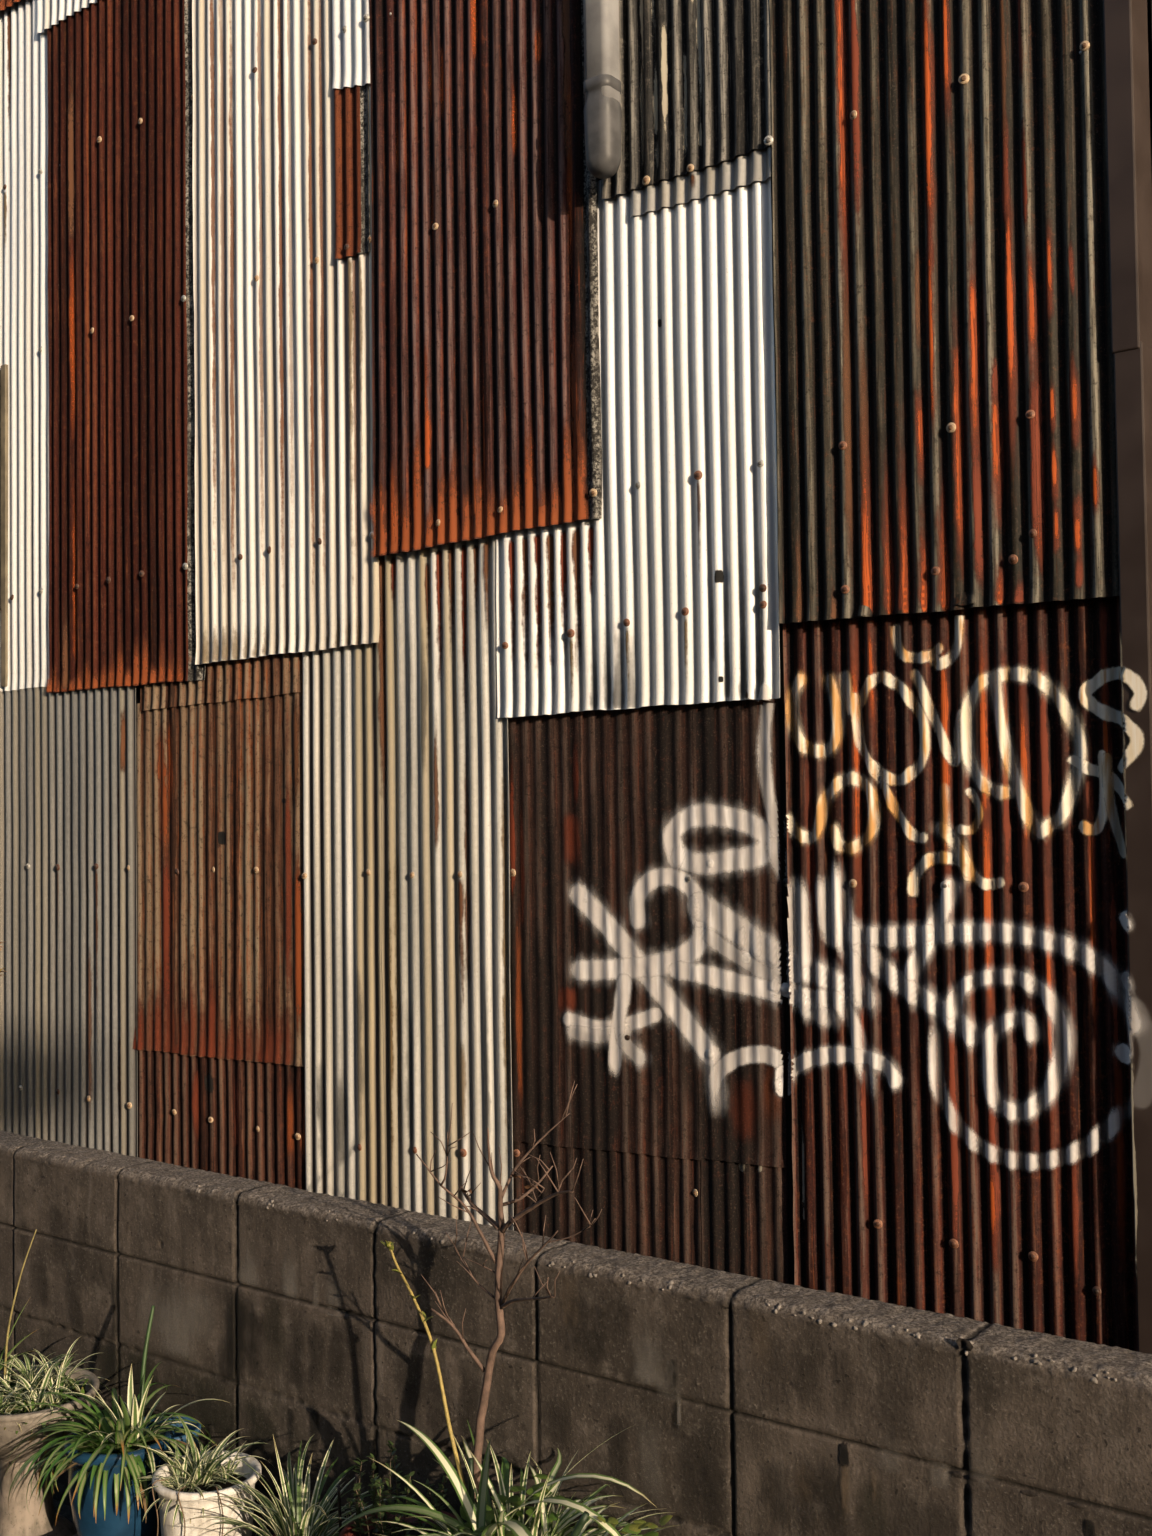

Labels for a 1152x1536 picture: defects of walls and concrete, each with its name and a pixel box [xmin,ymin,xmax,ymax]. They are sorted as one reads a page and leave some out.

corrosion [561,0,573,261]
corrosion [46,614,184,692]
corrosion [830,0,1099,1278]
corrosion [118,700,304,1140]
corrosion [287,1095,305,1163]
corrosion [458,769,470,991]
corrosion [501,766,525,1129]
corrosion [559,988,576,1014]
corrosion [805,765,816,994]
corrosion [1086,597,1127,1263]